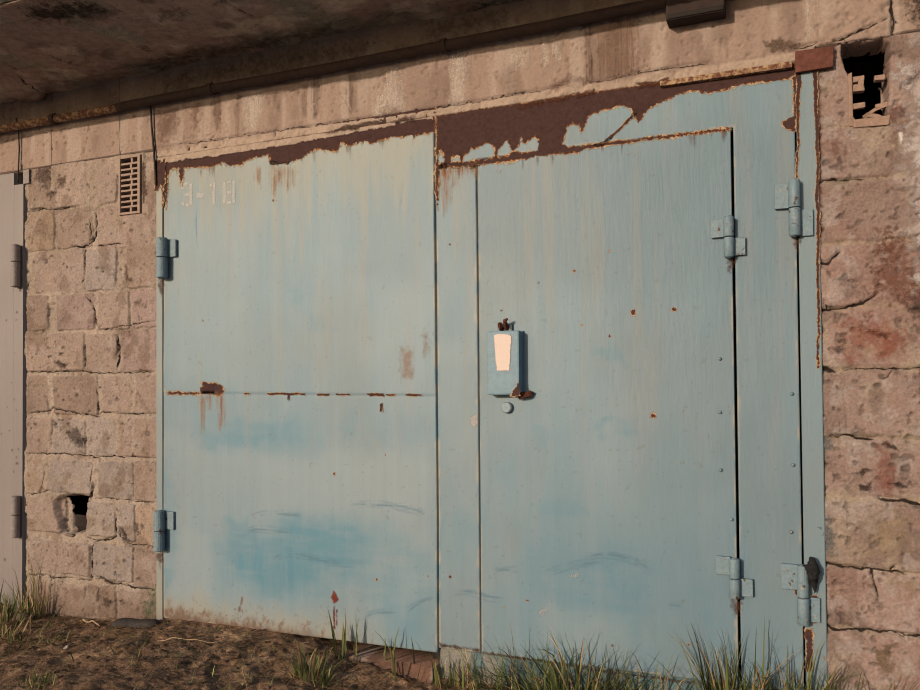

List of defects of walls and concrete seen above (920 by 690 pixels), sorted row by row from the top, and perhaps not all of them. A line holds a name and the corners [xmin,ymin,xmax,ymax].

leakage [18,2,106,23]
crack [793,0,897,49]
spalling [637,77,669,88]
spalling [518,89,595,109]
spalling [331,117,414,133]
rust [153,63,802,211]
rust [812,71,824,369]
rust [166,381,225,407]
rust [267,392,305,400]
rust [367,392,421,412]
crack [826,562,904,596]
crack [827,624,920,637]